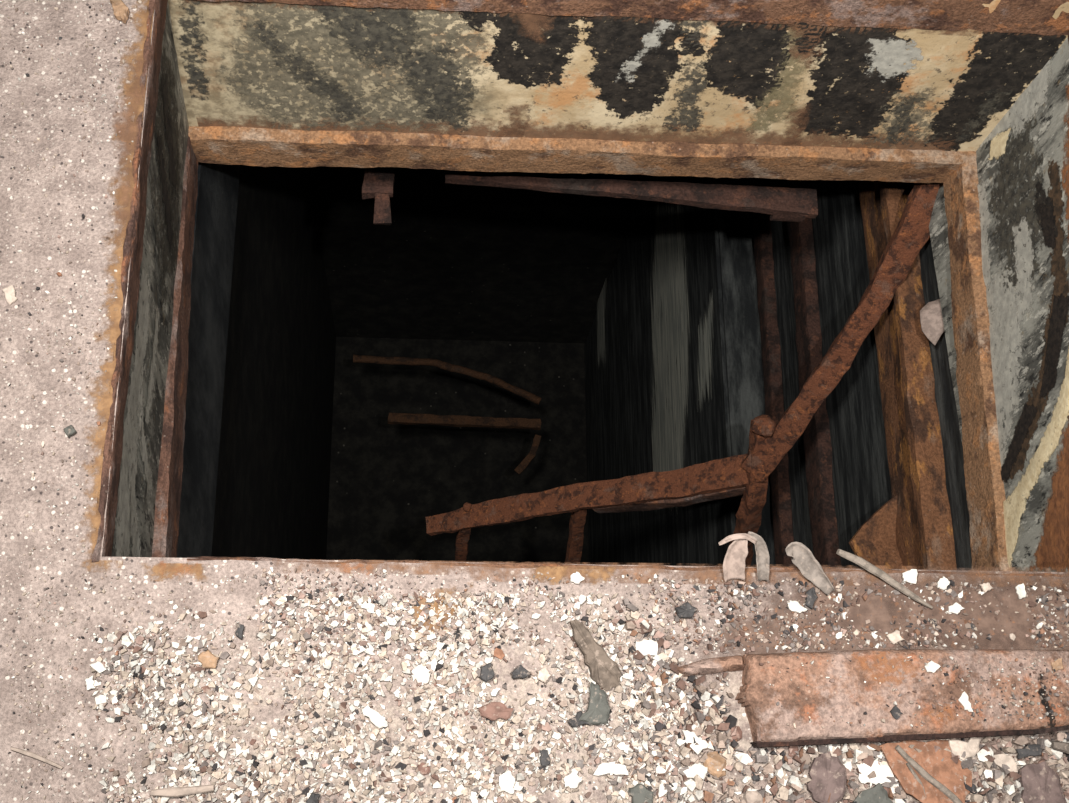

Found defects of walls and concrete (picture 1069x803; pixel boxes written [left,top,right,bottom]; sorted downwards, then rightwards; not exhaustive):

corrosion [489,12,550,40]
leakage [182,30,208,94]
leakage [244,20,366,122]
leakage [313,5,474,132]
leakage [746,28,808,133]
corrosion [196,105,955,150]
leakage [886,97,925,144]
leakage [151,74,176,307]
leakage [1034,182,1058,237]
corrosion [83,0,154,570]
corrosion [329,560,454,575]
corrosion [535,563,668,585]